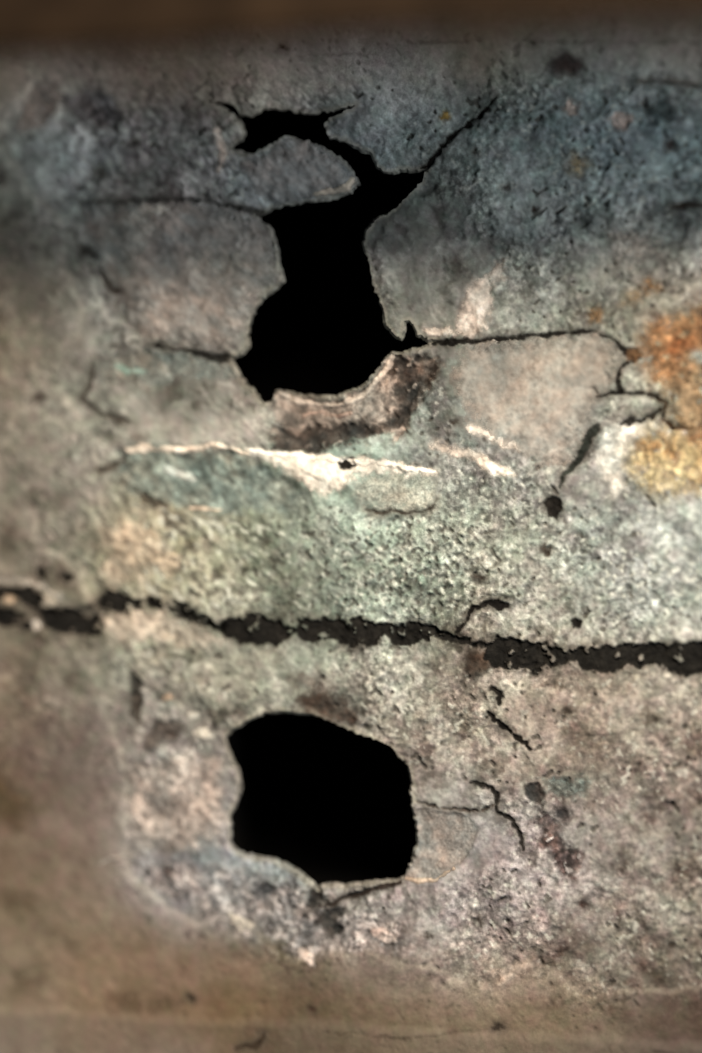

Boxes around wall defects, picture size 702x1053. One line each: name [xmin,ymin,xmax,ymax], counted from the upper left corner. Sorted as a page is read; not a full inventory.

crack [420,96,497,172]
crack [88,198,264,214]
spalling [94,100,439,470]
crack [145,343,231,364]
crack [431,329,702,488]
rust [634,309,702,488]
peeling [119,442,310,515]
peeling [357,474,435,515]
spalling [129,671,143,723]
crack [0,568,702,751]
spalling [100,710,479,966]
spalling [493,962,526,983]